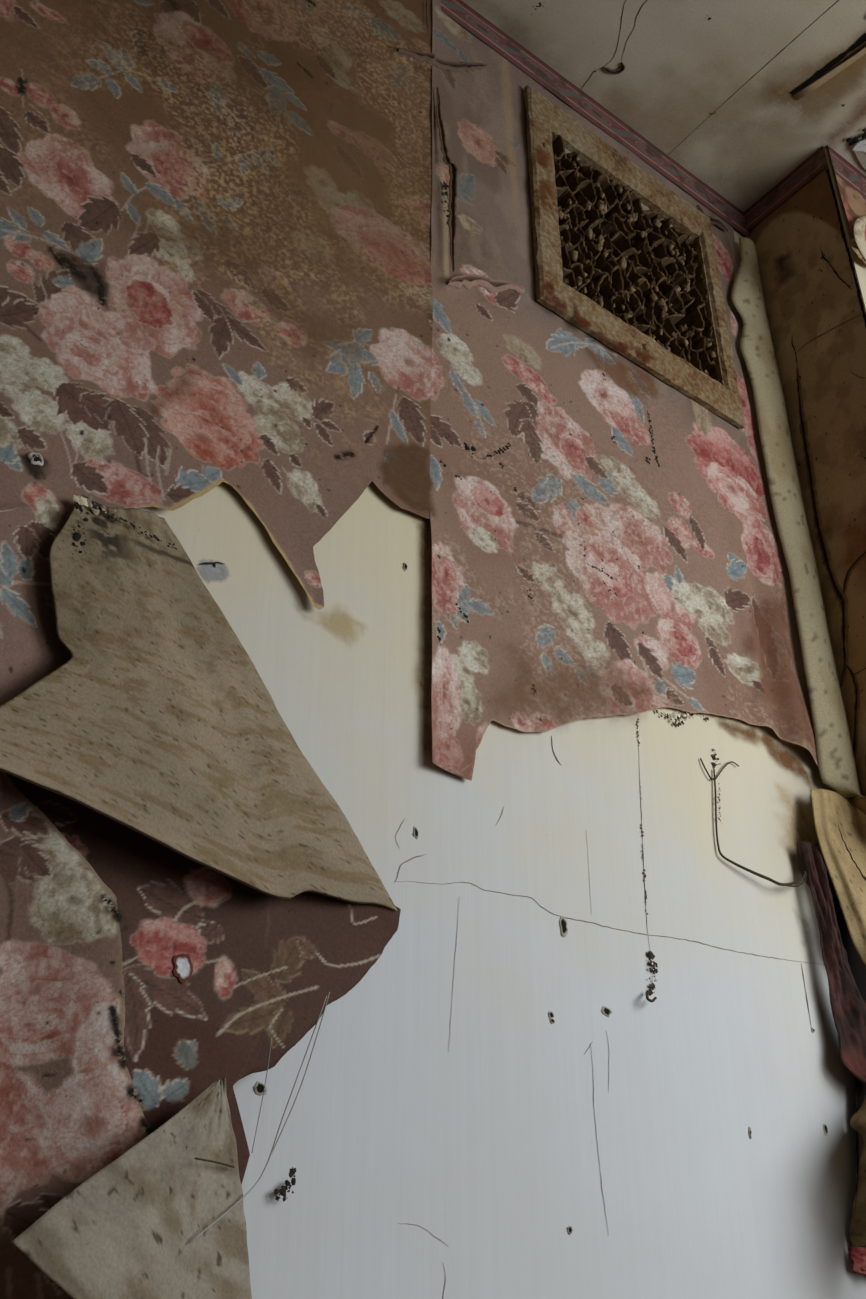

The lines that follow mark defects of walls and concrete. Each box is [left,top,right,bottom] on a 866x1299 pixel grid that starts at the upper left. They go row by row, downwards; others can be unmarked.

damp [768,43,866,113]
crack [791,247,866,768]
peeling [0,486,401,1299]
spalling [559,916,568,937]
crack [395,821,824,965]
peeling [797,789,866,1274]